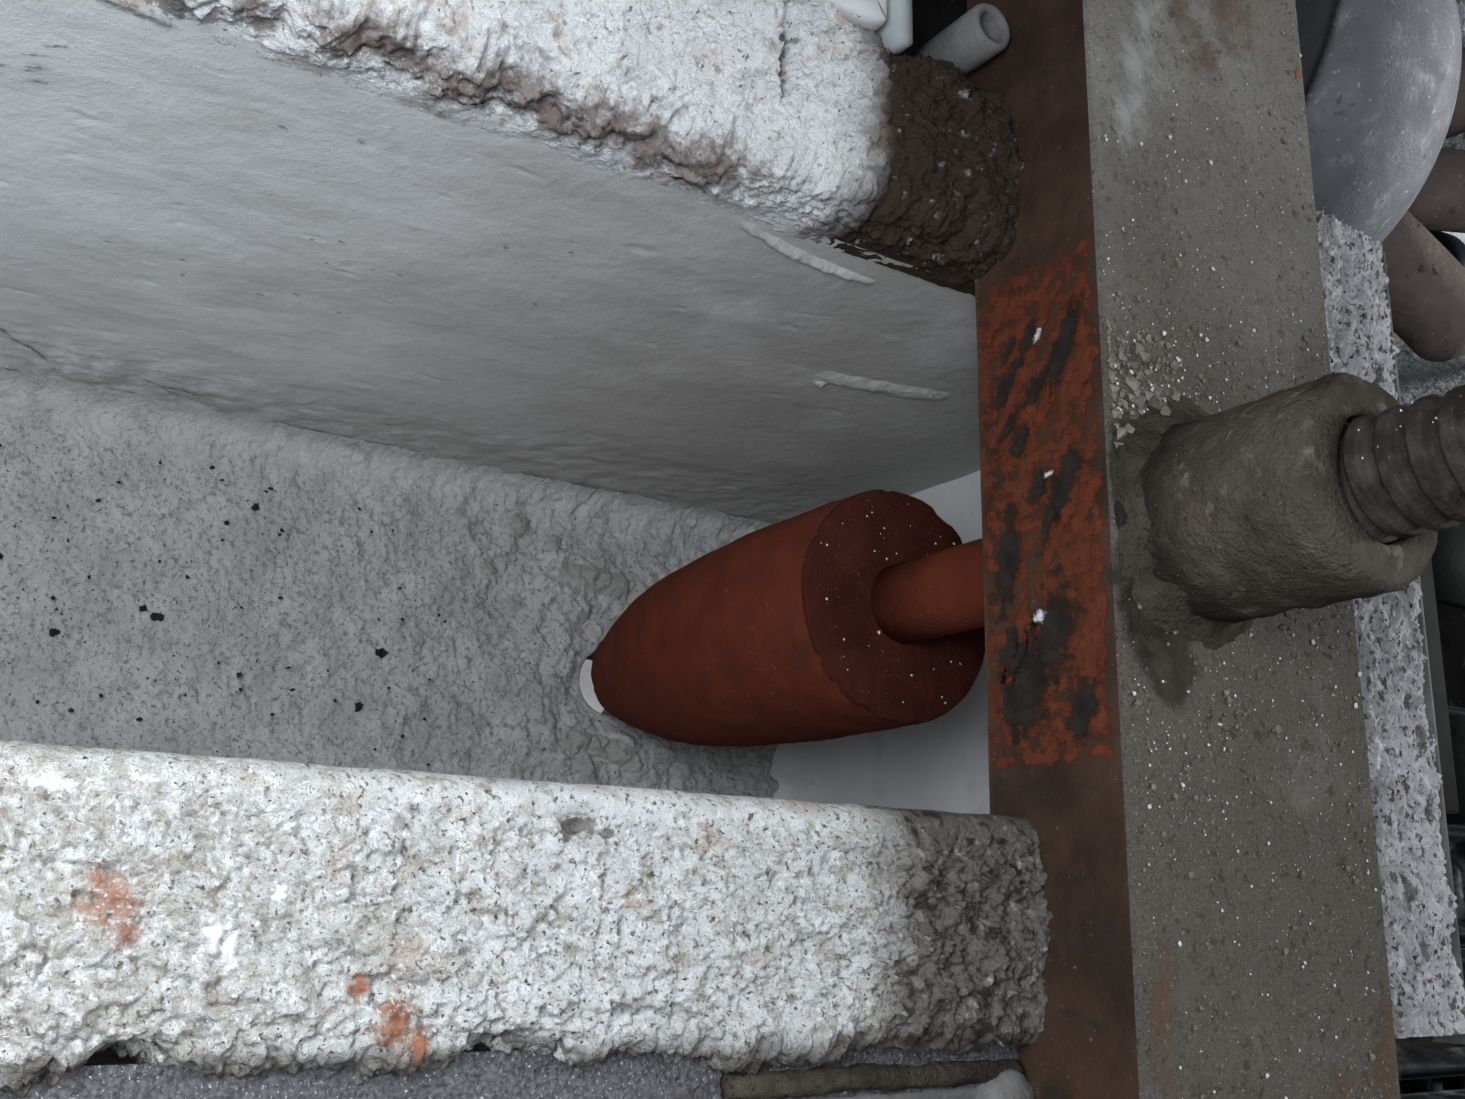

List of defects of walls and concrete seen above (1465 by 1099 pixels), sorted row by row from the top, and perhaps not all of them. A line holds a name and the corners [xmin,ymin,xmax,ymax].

crack [0,328,49,363]
corrosion [74,869,143,947]
corrosion [347,974,430,1065]